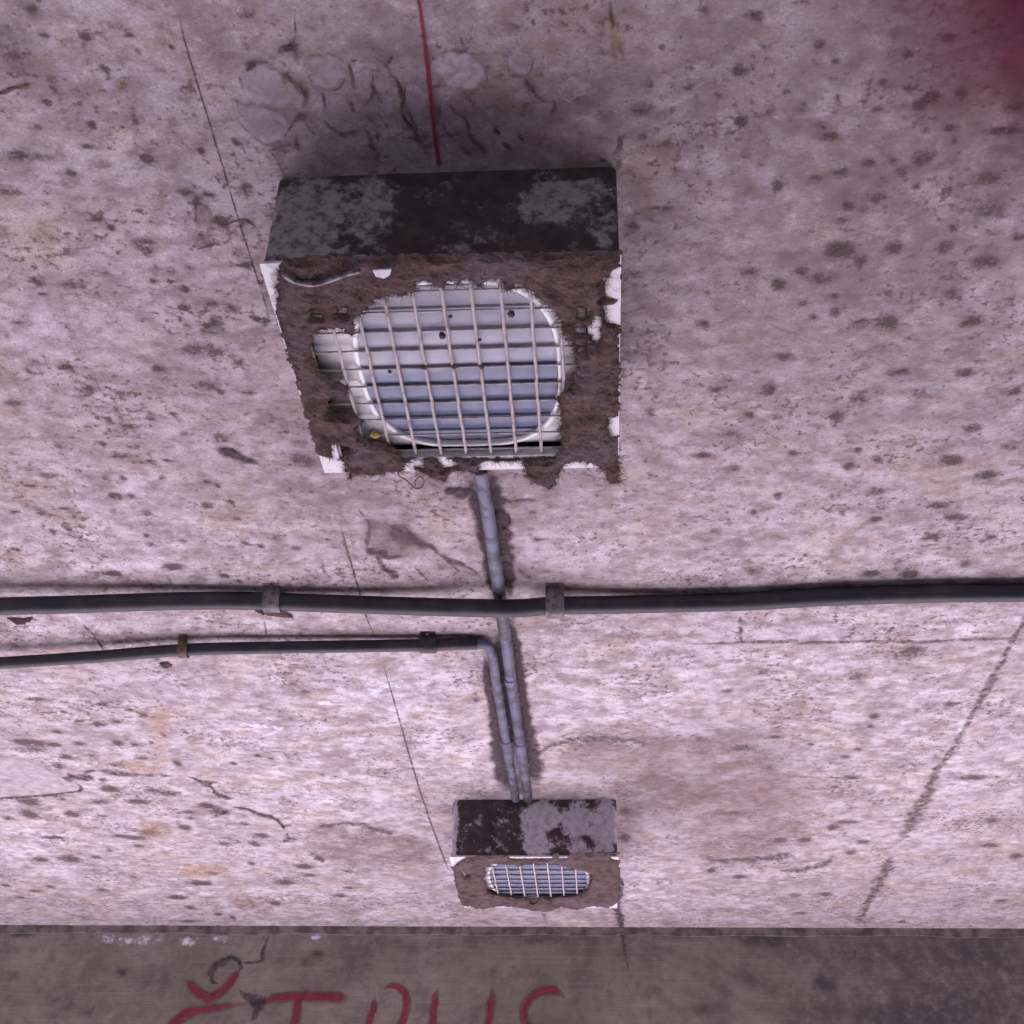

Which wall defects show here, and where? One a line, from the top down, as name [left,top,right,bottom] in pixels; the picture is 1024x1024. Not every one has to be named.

crack [366,57,423,151]
crack [600,135,624,169]
crack [716,618,1024,837]
crack [190,777,295,842]
crack [858,858,892,919]